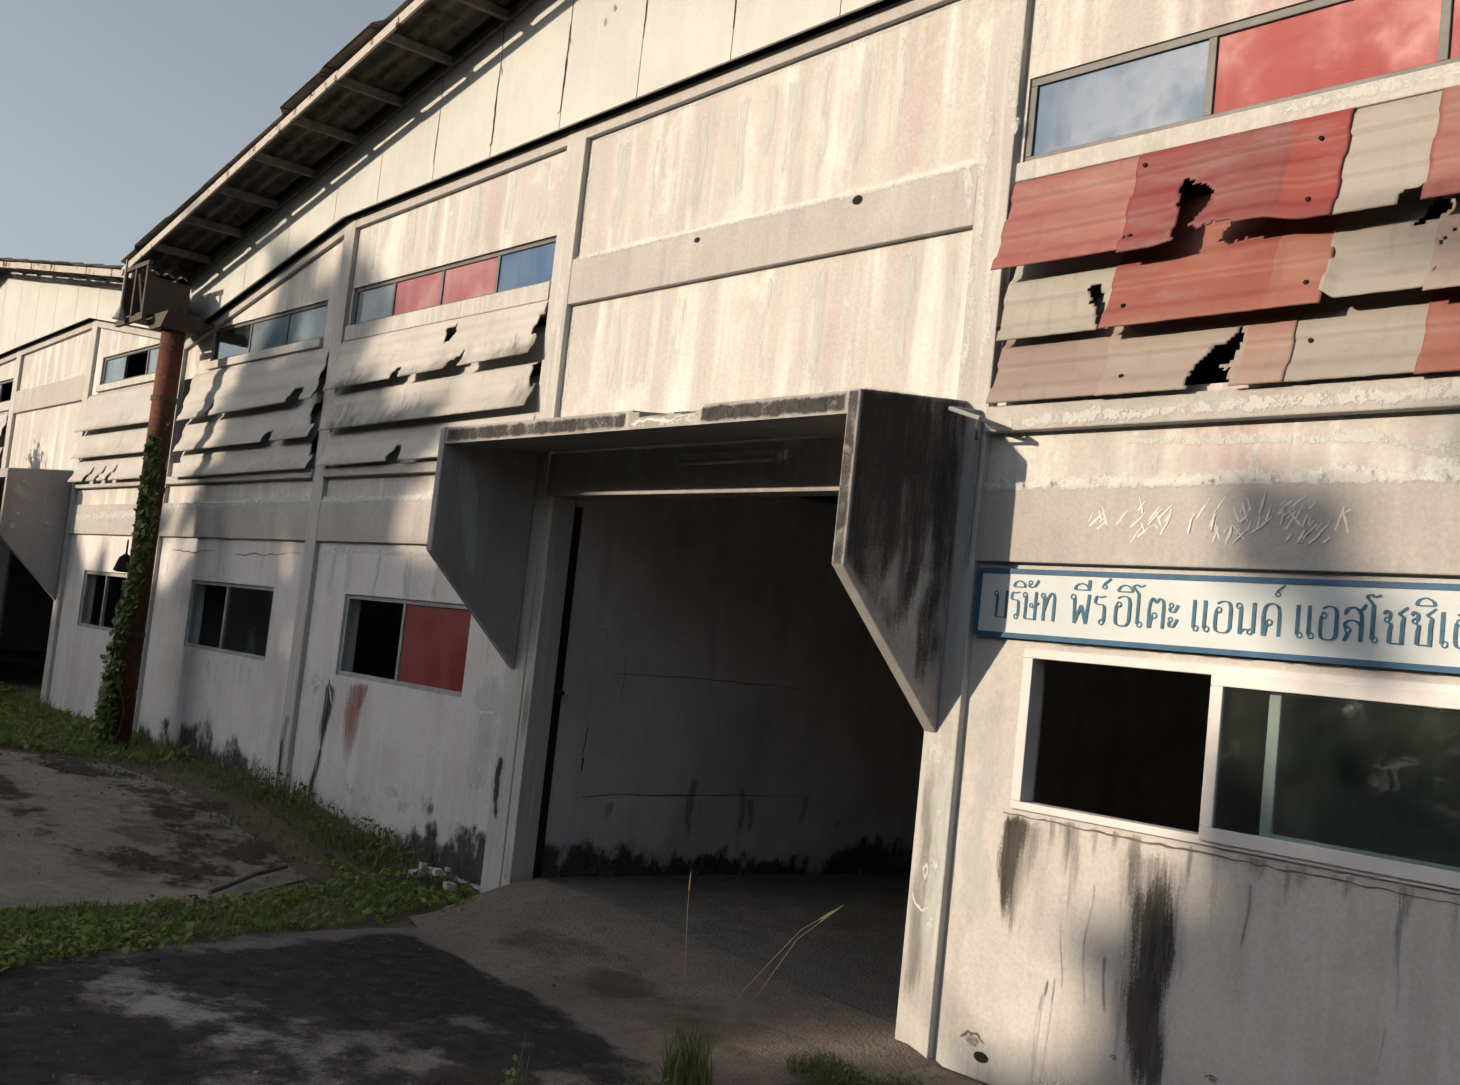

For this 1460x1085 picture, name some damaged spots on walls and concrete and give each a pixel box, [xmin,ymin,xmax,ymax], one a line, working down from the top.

damp [447,414,626,441]
peeling [1009,377,1460,428]
peeling [985,460,1460,491]
damp [701,389,965,676]
damp [138,718,248,775]
damp [393,805,486,886]
damp [541,835,913,877]
damp [998,816,1027,915]
damp [1126,874,1174,1085]